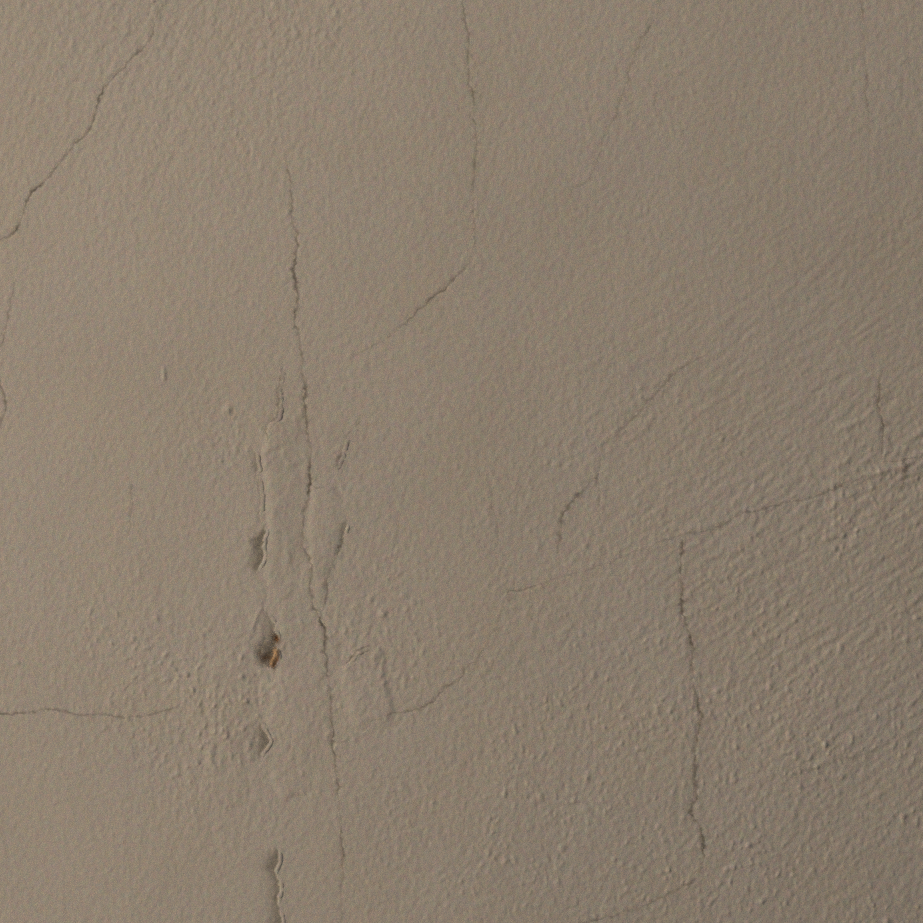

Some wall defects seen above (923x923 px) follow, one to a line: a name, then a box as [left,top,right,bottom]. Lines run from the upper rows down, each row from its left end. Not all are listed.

flaking render [255,451,269,570]